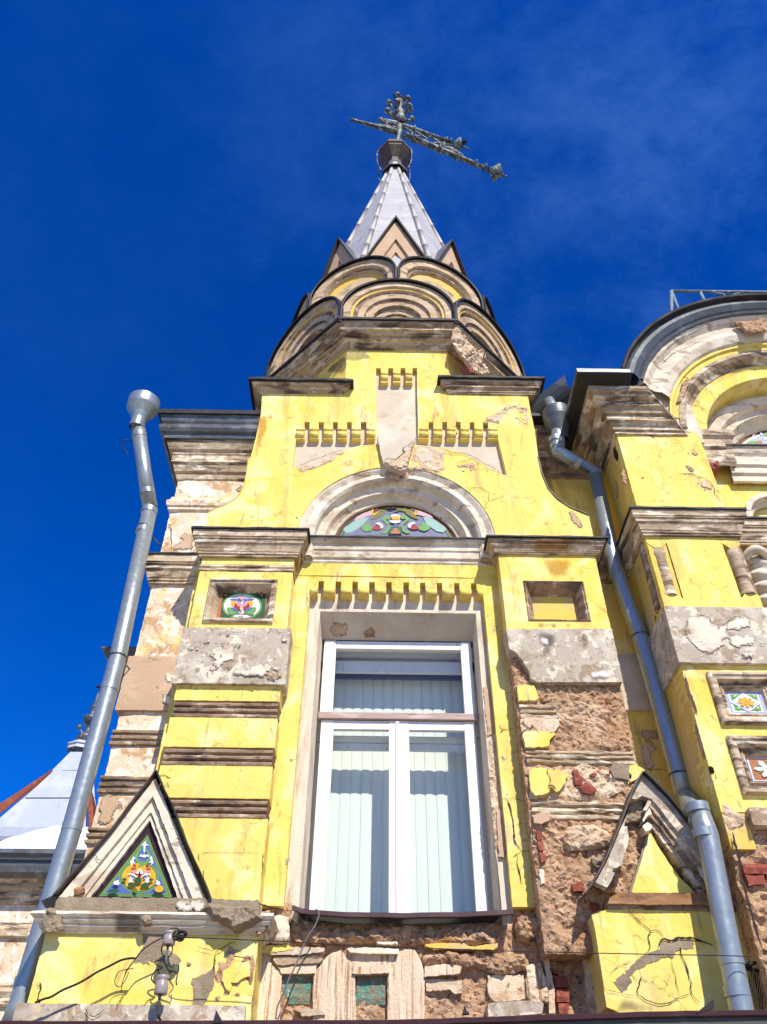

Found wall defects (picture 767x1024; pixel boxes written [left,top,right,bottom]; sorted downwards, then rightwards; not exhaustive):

spalling [734,318,767,333]
spalling [451,327,490,375]
spalling [484,405,529,426]
spalling [385,441,446,482]
peeling [188,632,284,682]
peeling [685,616,755,657]
peeling [98,794,122,824]
spalling [511,654,658,926]
crack [507,798,524,885]
spalling [215,946,255,1010]
crack [610,908,712,1005]